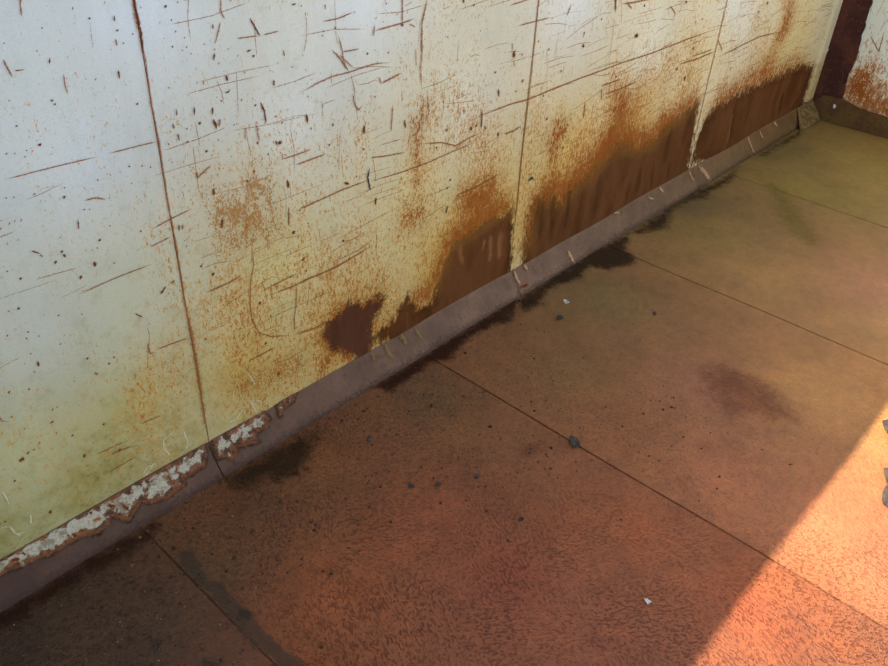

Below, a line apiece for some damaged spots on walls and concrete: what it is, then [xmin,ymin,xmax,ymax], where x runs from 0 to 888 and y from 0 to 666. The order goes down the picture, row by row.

rust [133,0,209,428]
rust [188,158,293,265]
rust [401,3,435,185]
leakage [371,63,814,391]
rust [408,0,815,312]
rust [228,276,399,399]
leakage [225,433,319,489]